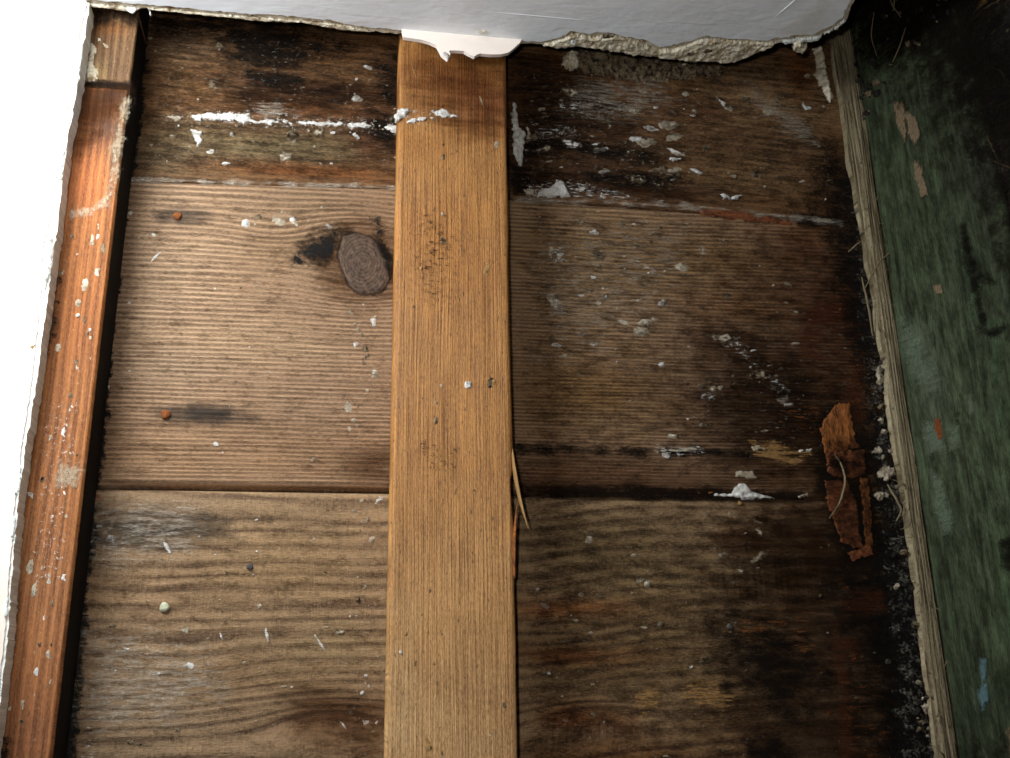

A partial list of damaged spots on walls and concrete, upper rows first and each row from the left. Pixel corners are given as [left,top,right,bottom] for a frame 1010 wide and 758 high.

flaking render [543,18,847,64]
water stain [192,56,458,154]
water stain [507,102,676,195]
mould [848,0,1010,234]
water stain [369,216,393,263]
water stain [53,8,352,758]
water stain [521,484,741,501]
water stain [515,443,765,457]
water stain [724,147,933,758]